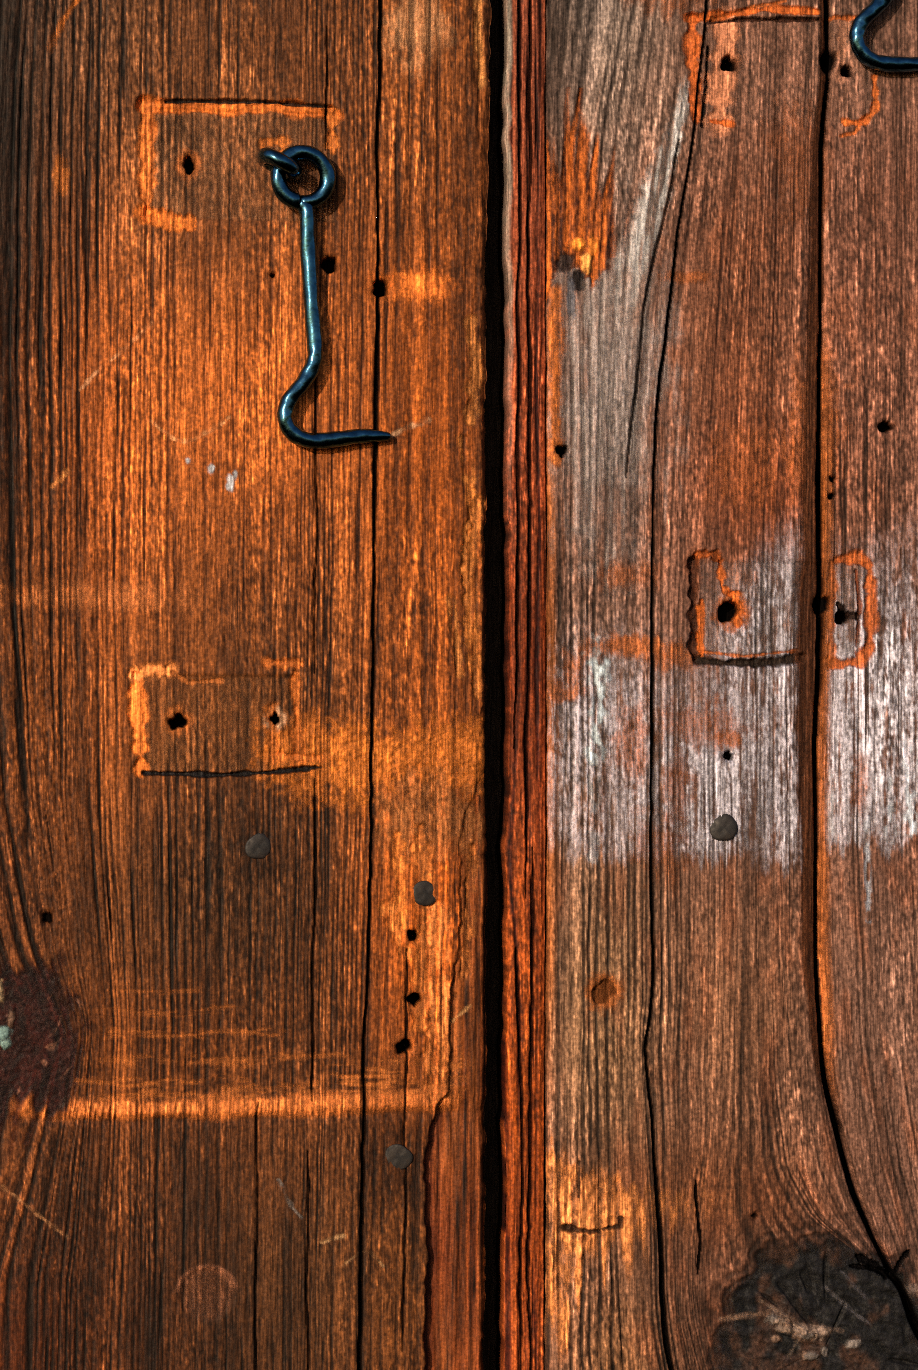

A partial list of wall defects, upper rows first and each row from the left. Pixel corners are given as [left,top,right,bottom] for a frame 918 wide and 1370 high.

crack [625,0,708,1370]
crack [795,0,918,1339]